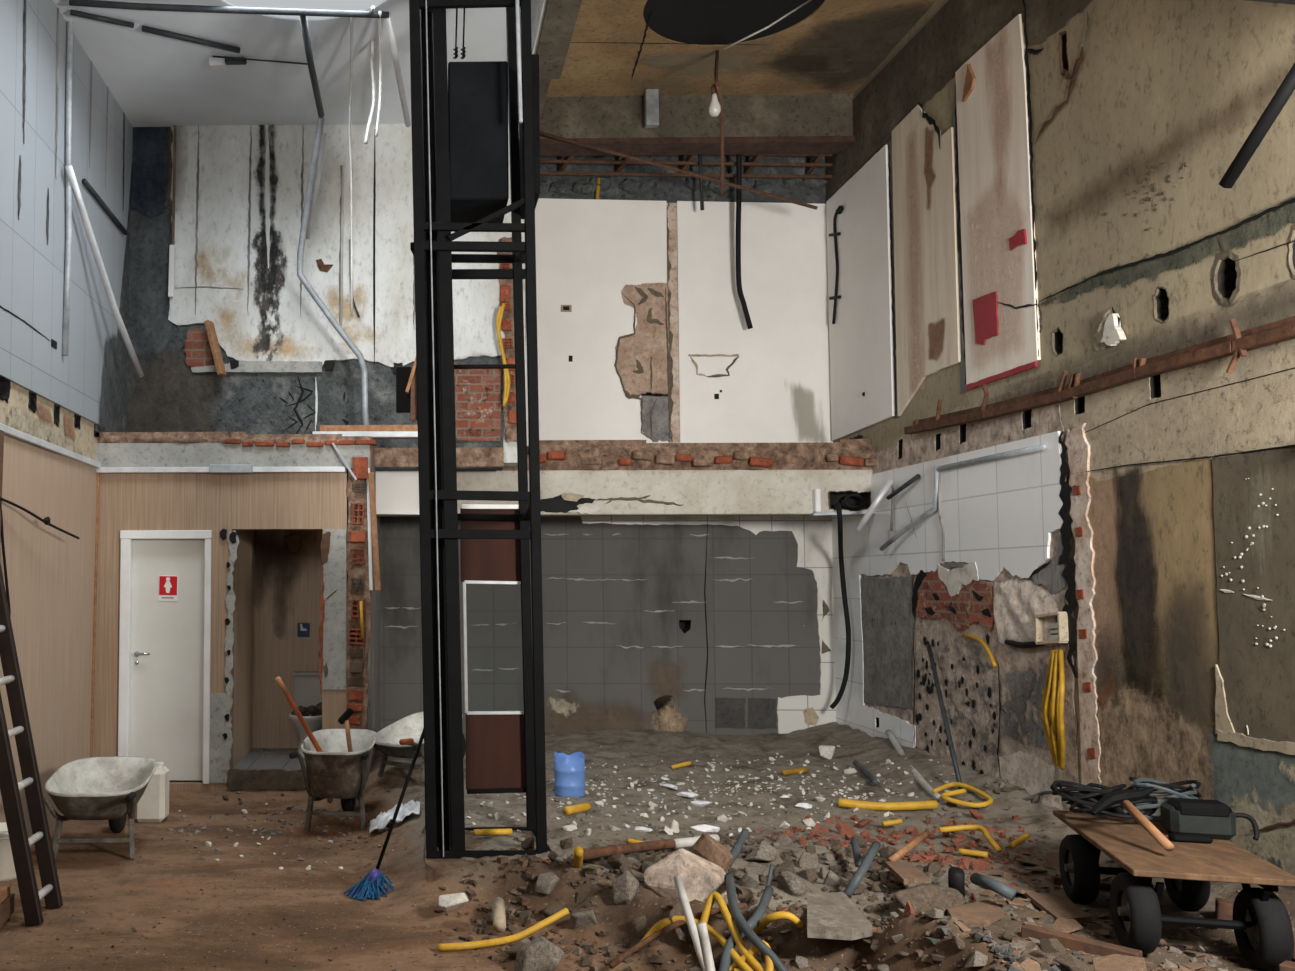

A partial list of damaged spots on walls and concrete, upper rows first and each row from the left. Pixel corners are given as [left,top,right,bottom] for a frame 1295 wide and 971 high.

flaking render [184,329,214,367]
damp [252,124,287,361]
crack [279,377,318,434]
peeling [316,259,333,272]
peeling [614,283,672,442]
crack [918,81,966,383]
crack [998,0,1295,357]
flaking render [651,699,688,732]
flaking render [715,697,777,729]
flaking render [860,527,1085,810]
peeling [1083,665,1295,876]
damp [1097,468,1295,816]